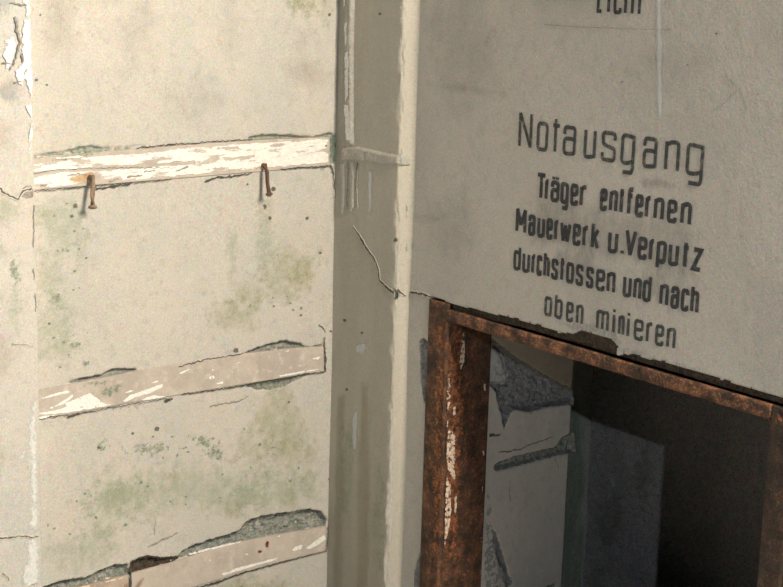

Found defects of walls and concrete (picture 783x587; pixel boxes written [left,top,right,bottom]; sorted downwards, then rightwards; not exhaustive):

peeling [3,0,336,198]
crack [0,139,253,248]
crack [283,145,431,299]
flaking render [247,356,321,389]
flaking render [249,341,322,352]
flaking render [484,339,574,427]
flaking render [440,299,783,404]
flaking render [19,368,327,587]
corrosion [432,323,466,558]
peeling [444,369,457,544]
flaking render [494,433,576,471]
flaking render [480,525,513,587]